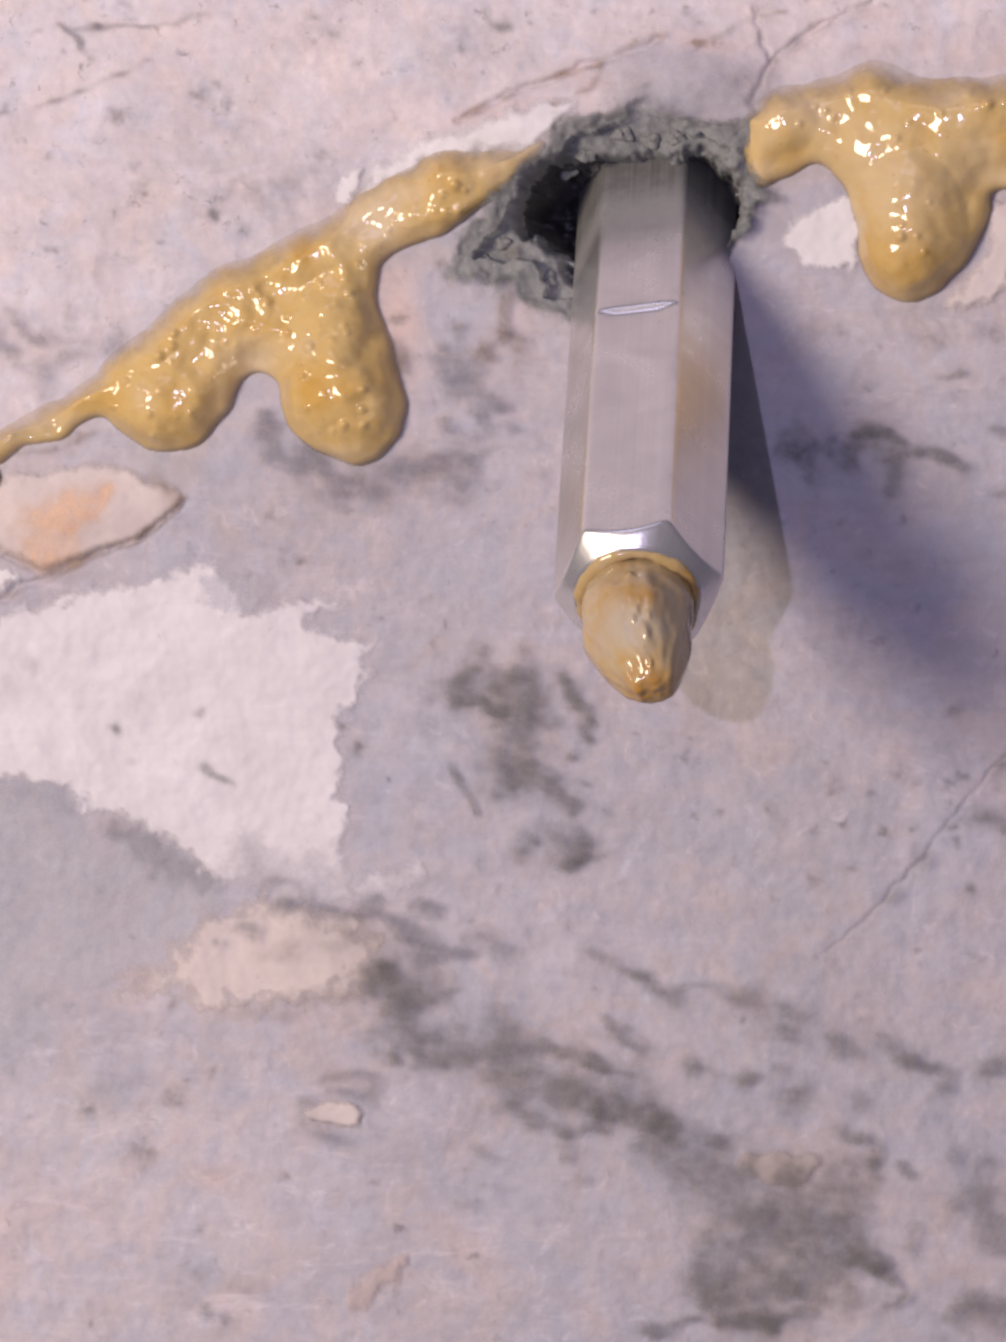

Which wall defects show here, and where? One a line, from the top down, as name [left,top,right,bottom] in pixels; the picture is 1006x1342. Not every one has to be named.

spalling [337,85,774,323]
peeling [784,196,859,269]
peeling [945,202,1006,309]
peeling [0,562,426,1012]